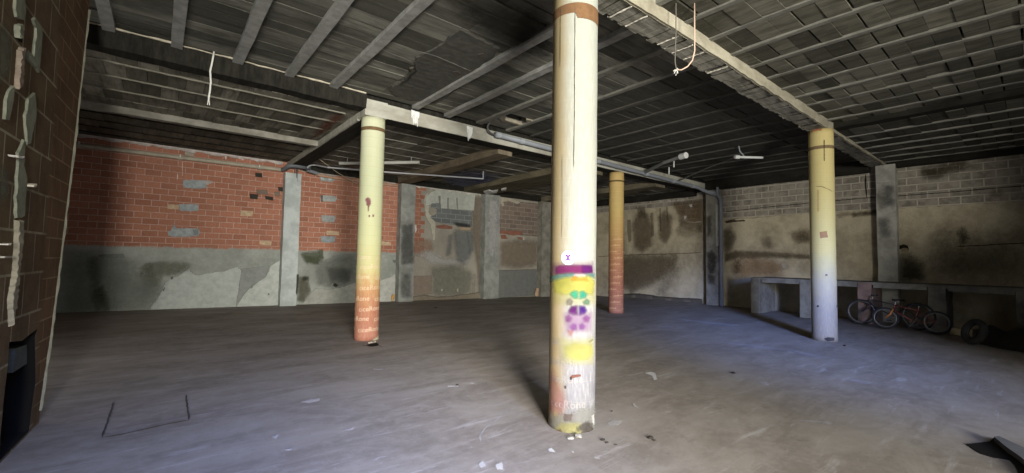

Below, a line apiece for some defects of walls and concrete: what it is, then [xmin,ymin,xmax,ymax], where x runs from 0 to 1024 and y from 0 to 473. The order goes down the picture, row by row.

flaking render [424,190,475,240]
leakage [143,262,186,275]
flaking render [149,260,280,310]
leakage [624,204,702,293]